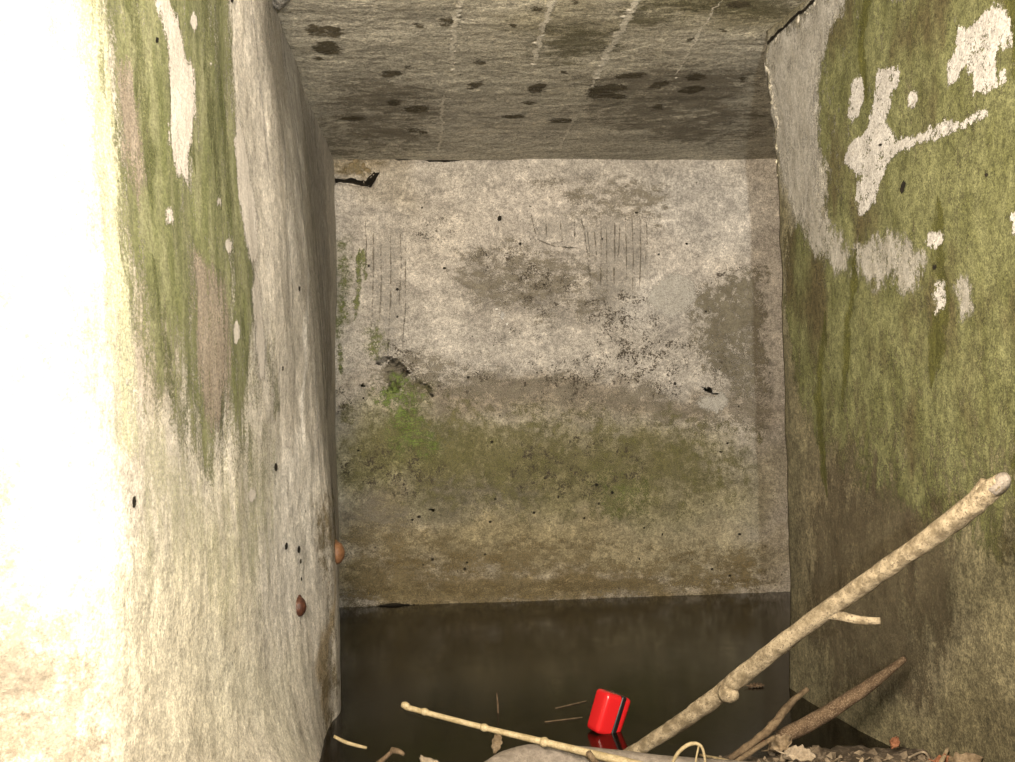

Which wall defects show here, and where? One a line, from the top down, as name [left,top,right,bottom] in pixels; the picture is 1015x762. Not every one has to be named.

crack [395,0,467,164]
crack [530,0,557,67]
crack [591,0,642,87]
leakage [527,0,802,144]
crack [767,0,815,45]
peeling [764,0,943,295]
peeling [844,65,988,216]
peeling [947,2,1013,96]
peeling [933,275,974,320]
leakage [804,438,942,612]
leakage [317,493,773,733]
leakage [808,537,954,713]